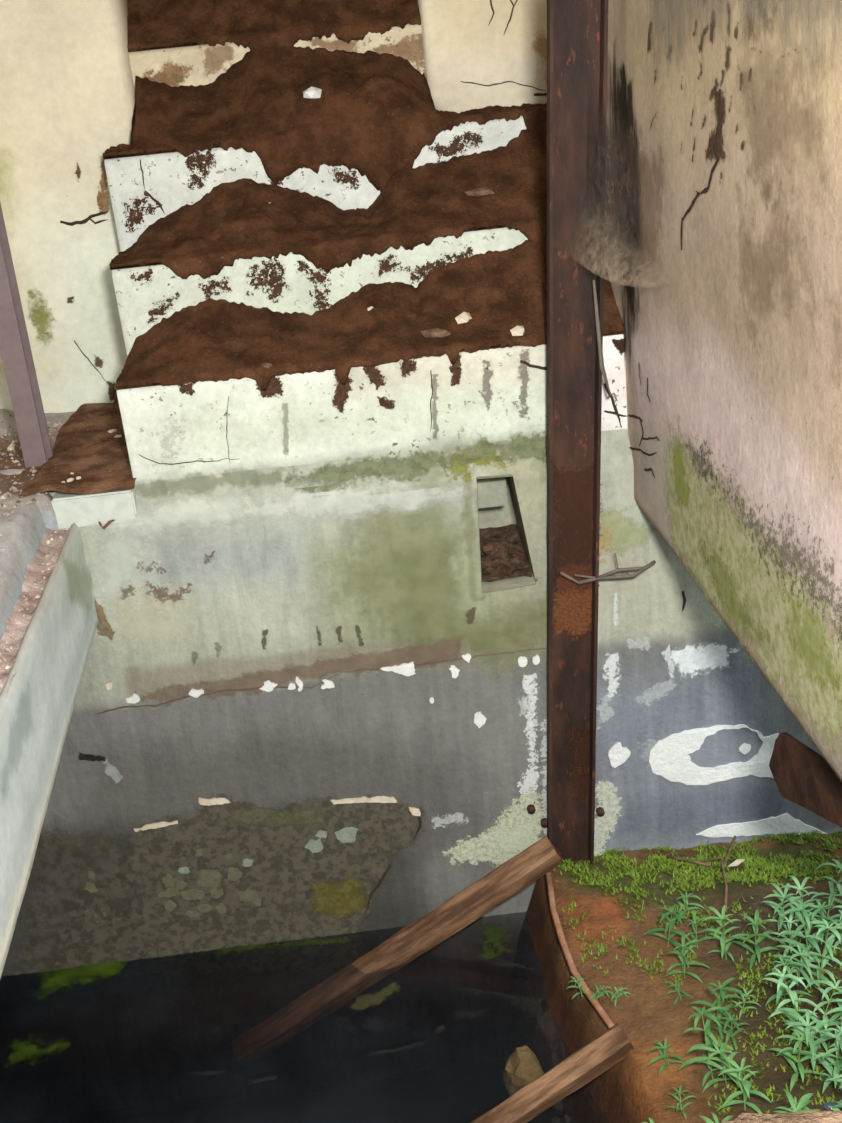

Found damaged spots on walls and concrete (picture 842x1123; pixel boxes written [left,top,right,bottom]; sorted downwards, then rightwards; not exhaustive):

crack [488,0,518,34]
crack [60,211,108,226]
peeling [97,160,162,233]
water stain [607,57,639,360]
crack [681,89,725,250]
peeling [246,257,332,311]
crack [604,377,660,478]
water stain [681,429,842,656]
rust [552,561,600,641]
water stain [661,642,739,678]
spalling [594,428,842,854]
spalling [0,441,547,1123]